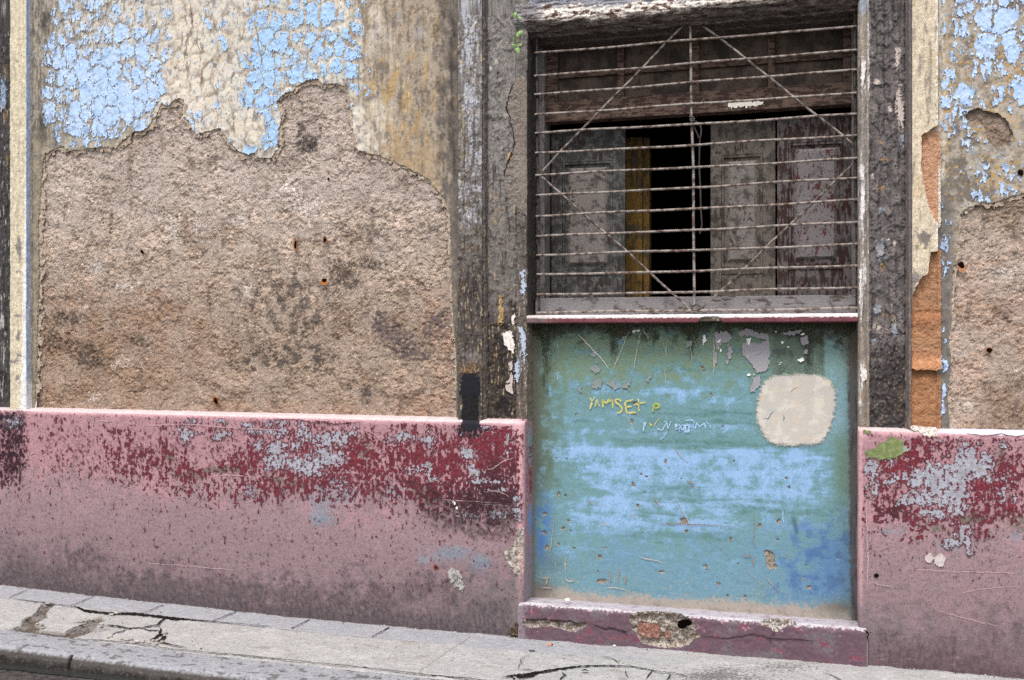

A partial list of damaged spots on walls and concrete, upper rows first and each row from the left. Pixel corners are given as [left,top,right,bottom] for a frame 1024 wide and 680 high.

crack [491,71,515,181]
spalling [0,0,528,599]
spalling [860,0,1024,581]
peeling [686,328,809,393]
crack [6,598,692,680]
spalling [509,619,588,637]
spalling [629,611,702,648]